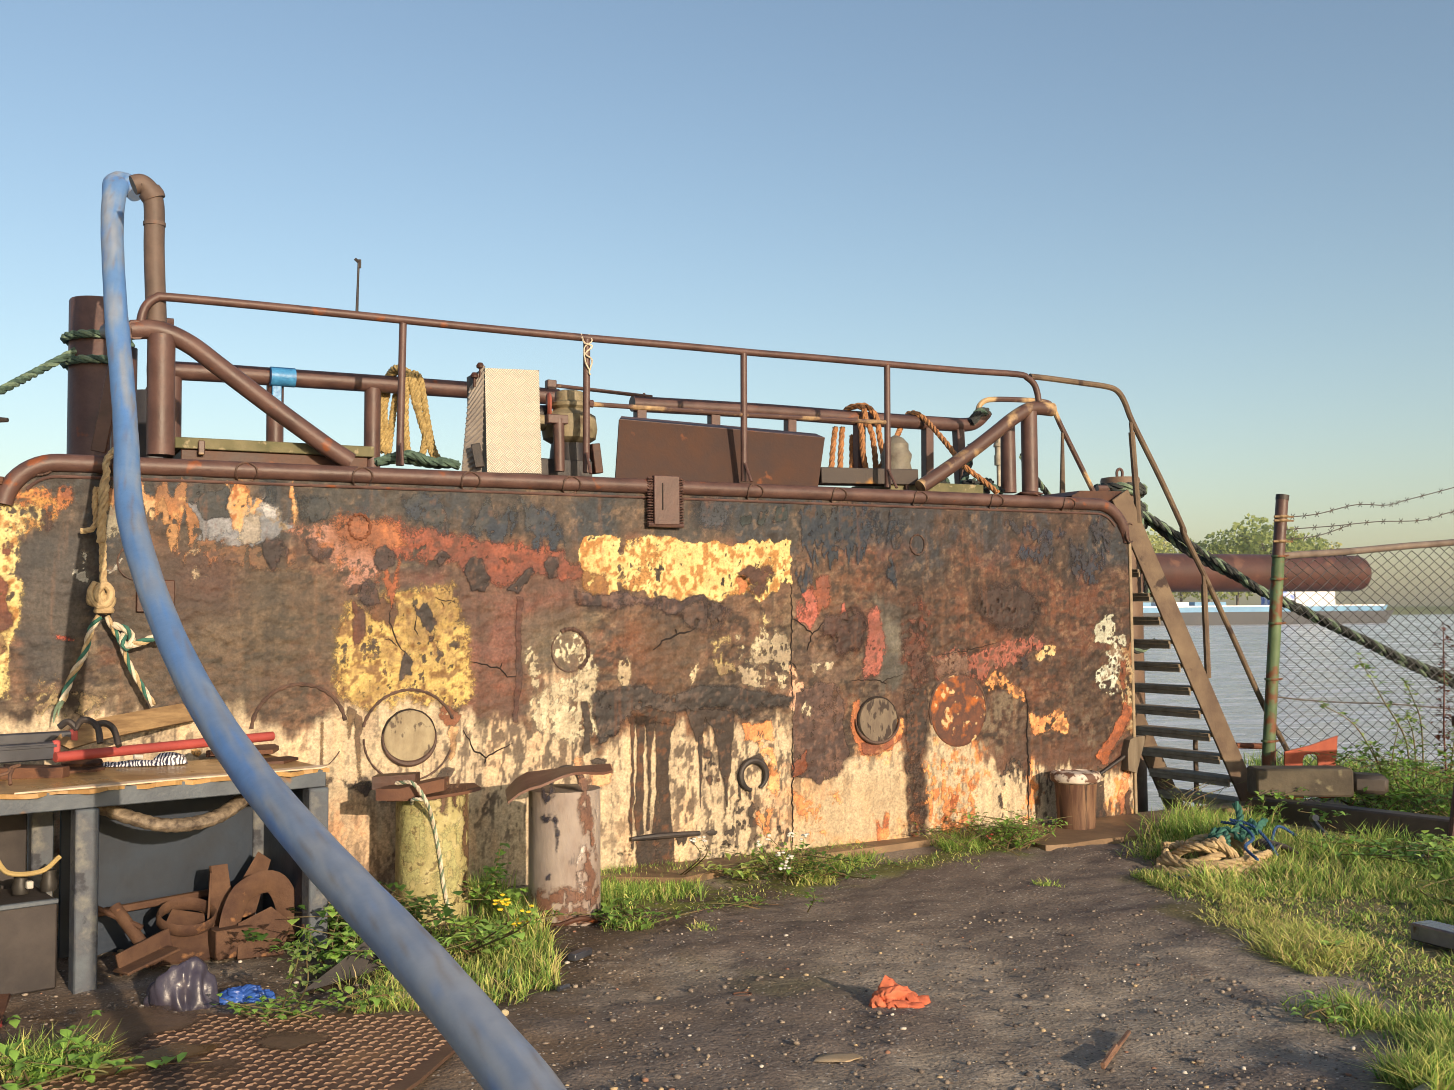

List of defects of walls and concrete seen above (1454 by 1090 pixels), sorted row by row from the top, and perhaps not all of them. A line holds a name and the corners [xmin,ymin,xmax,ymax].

peeling [184,498,846,750]
peeling [863,606,886,680]
peeling [1094,614,1126,696]
water stain [581,691,611,755]
rust [985,670,1069,735]
rust [1096,641,1135,765]
water stain [628,707,790,866]
rust [922,757,977,833]
rust [1118,771,1131,814]